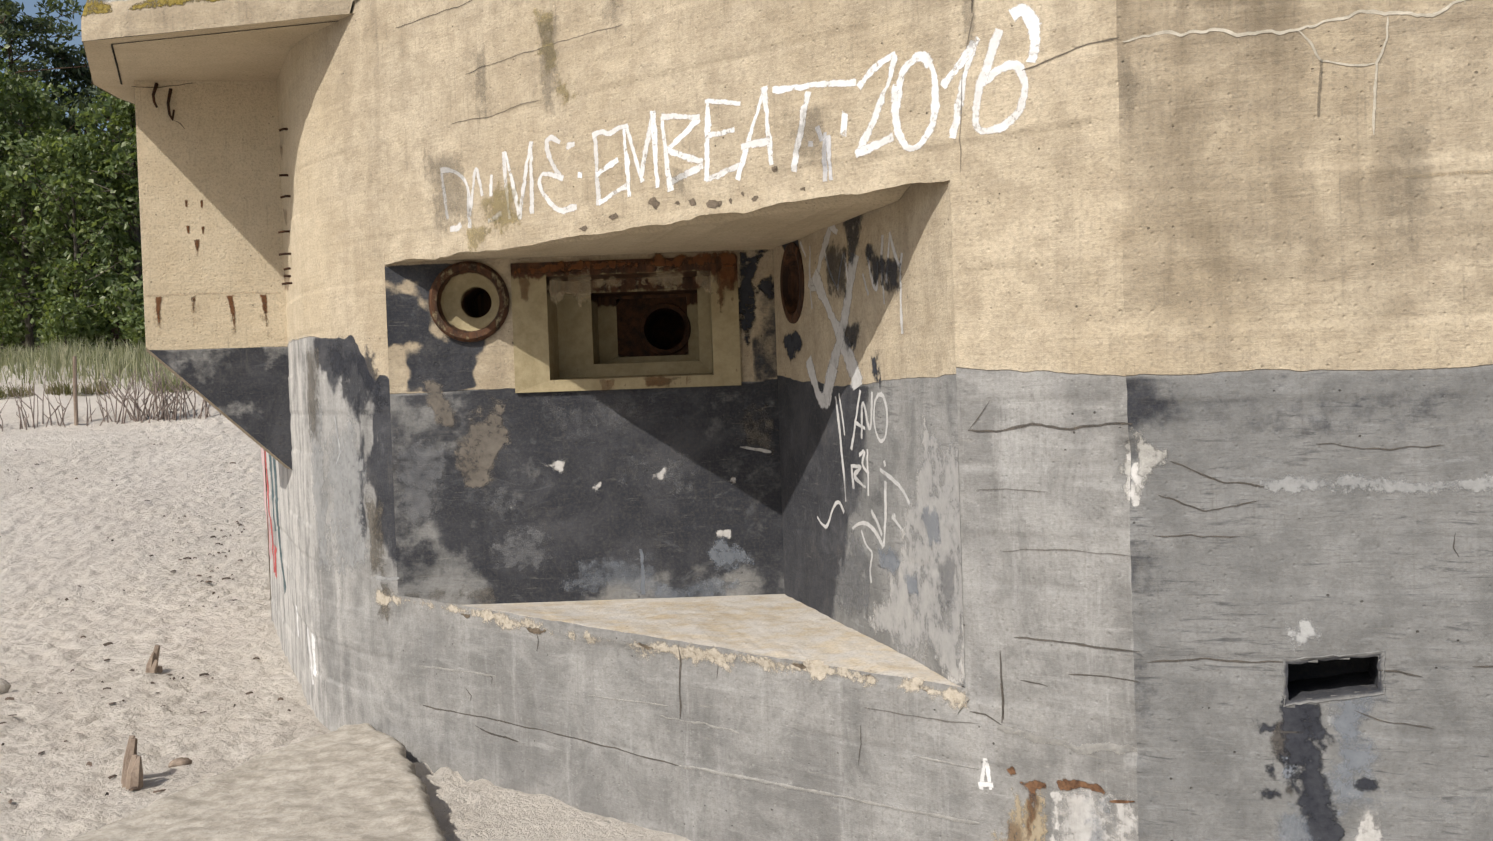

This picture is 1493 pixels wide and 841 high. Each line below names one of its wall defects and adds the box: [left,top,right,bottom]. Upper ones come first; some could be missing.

crack [396,0,472,28]
crack [467,25,620,74]
crack [1022,0,1466,135]
crack [452,100,539,124]
rust [227,295,235,330]
rust [512,251,737,307]
peeling [738,240,800,345]
peeling [826,215,901,294]
peeling [393,380,509,524]
spalling [1119,431,1167,506]
peeling [1259,699,1345,841]
rust [991,790,1048,841]